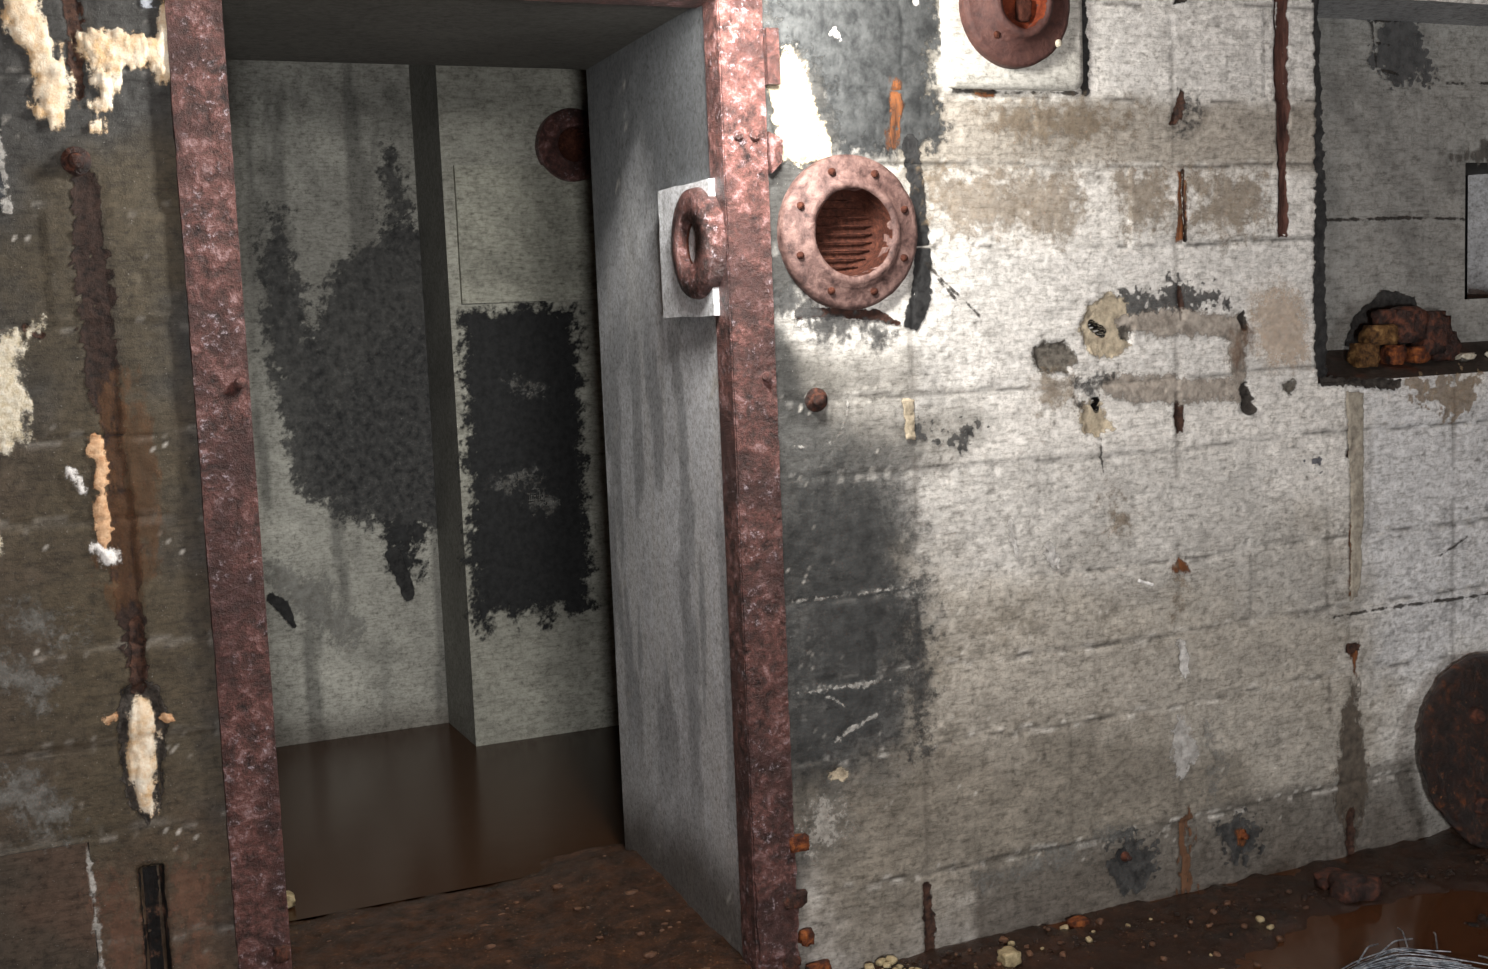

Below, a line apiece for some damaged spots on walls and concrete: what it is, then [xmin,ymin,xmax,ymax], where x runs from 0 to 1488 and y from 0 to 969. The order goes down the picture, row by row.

damp [0,0,170,134]
damp [897,579,939,761]
corrosion [789,833,810,853]
corrosion [783,889,808,910]
corrosion [782,927,832,969]